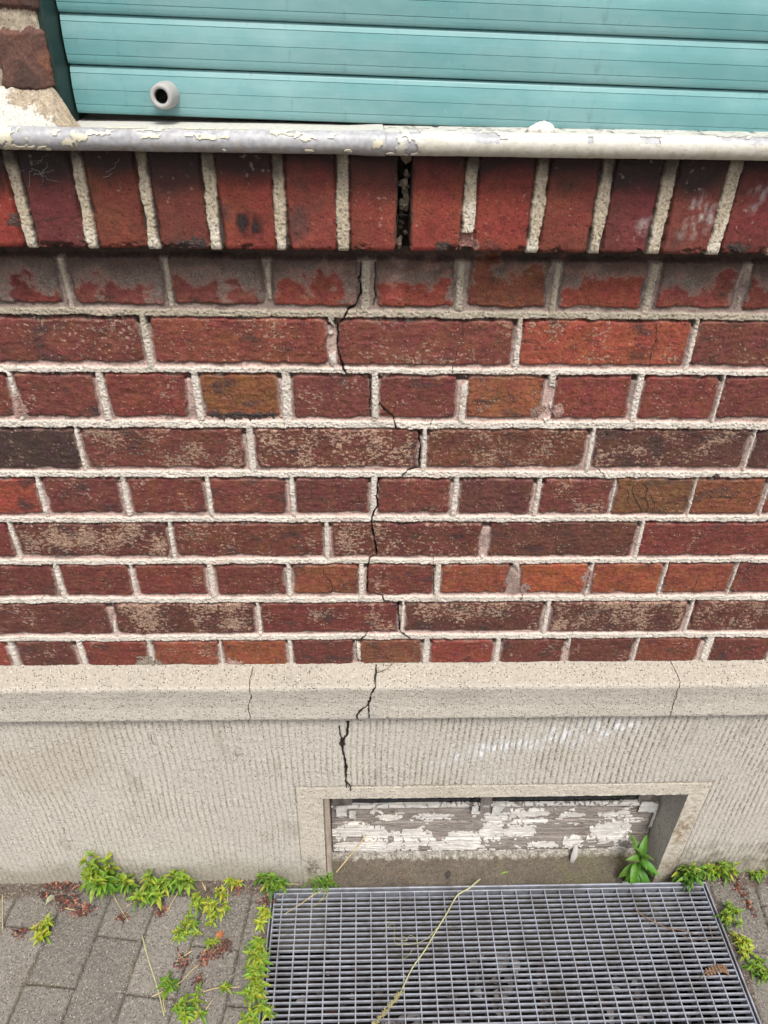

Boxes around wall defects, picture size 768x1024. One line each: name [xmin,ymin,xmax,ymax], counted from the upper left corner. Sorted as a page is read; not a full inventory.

peeling [0,118,768,161]
crack [337,262,433,791]
crack [232,659,253,719]
peeling [331,800,659,863]